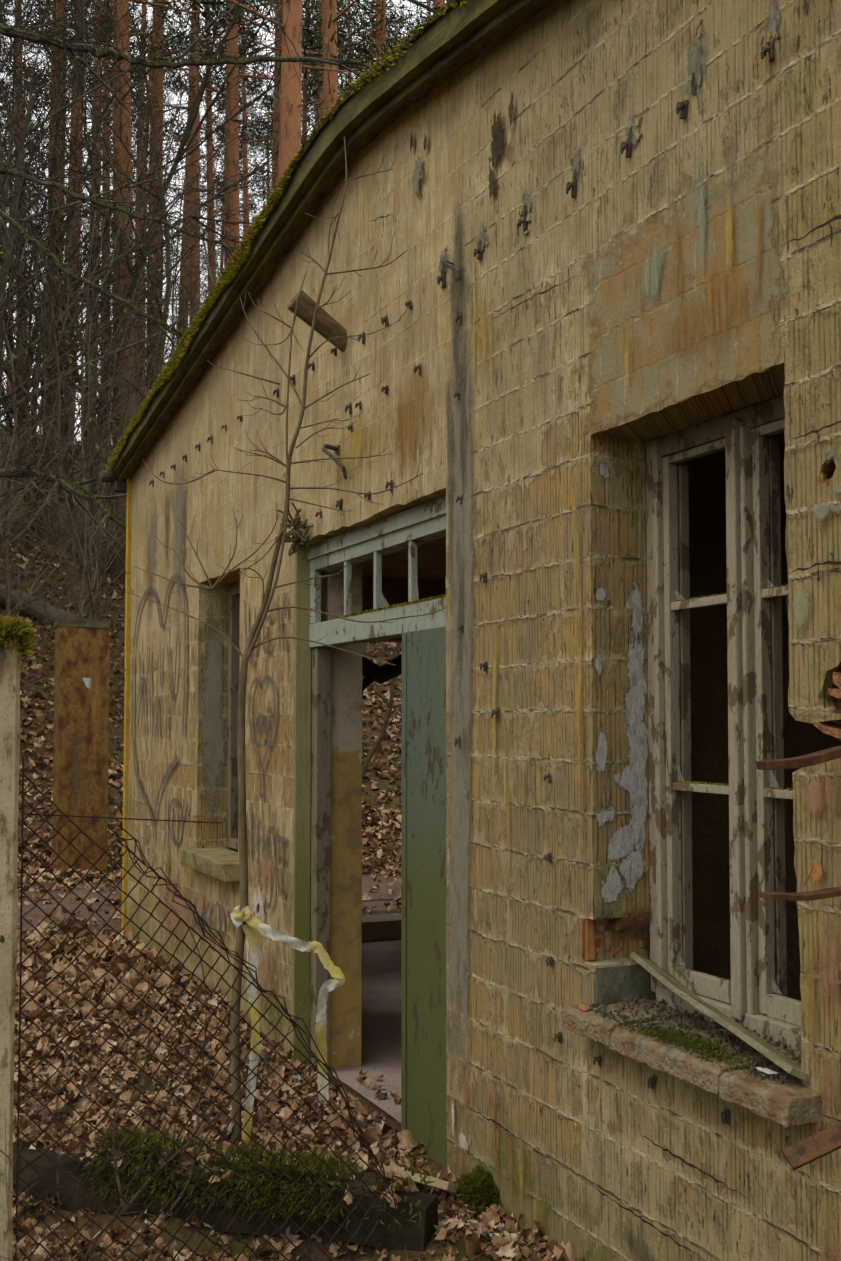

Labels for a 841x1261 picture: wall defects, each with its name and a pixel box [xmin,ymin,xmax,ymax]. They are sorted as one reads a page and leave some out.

crack [781,215,841,248]
rust [662,198,762,357]
spalling [817,448,841,485]
spalling [812,666,841,741]
flaking render [580,573,651,966]